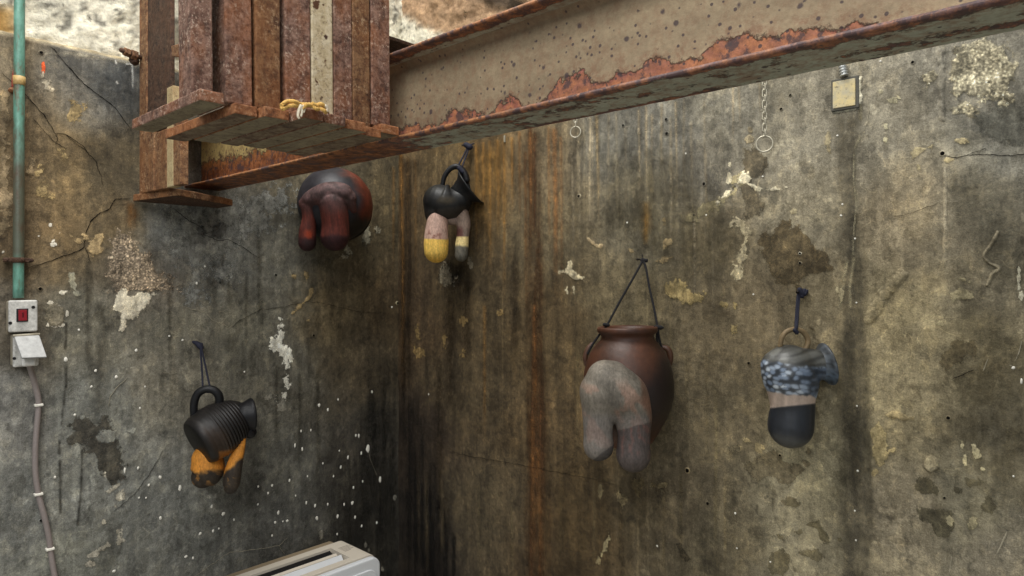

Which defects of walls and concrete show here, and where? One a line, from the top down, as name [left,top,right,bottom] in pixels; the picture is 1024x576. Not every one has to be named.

crack [51,47,132,130]
spalling [917,37,1024,146]
crack [4,75,129,268]
flaking render [910,144,954,170]
flaking render [71,181,300,332]
flaking render [558,260,585,294]
flaking render [663,277,707,305]
water stain [336,162,456,576]